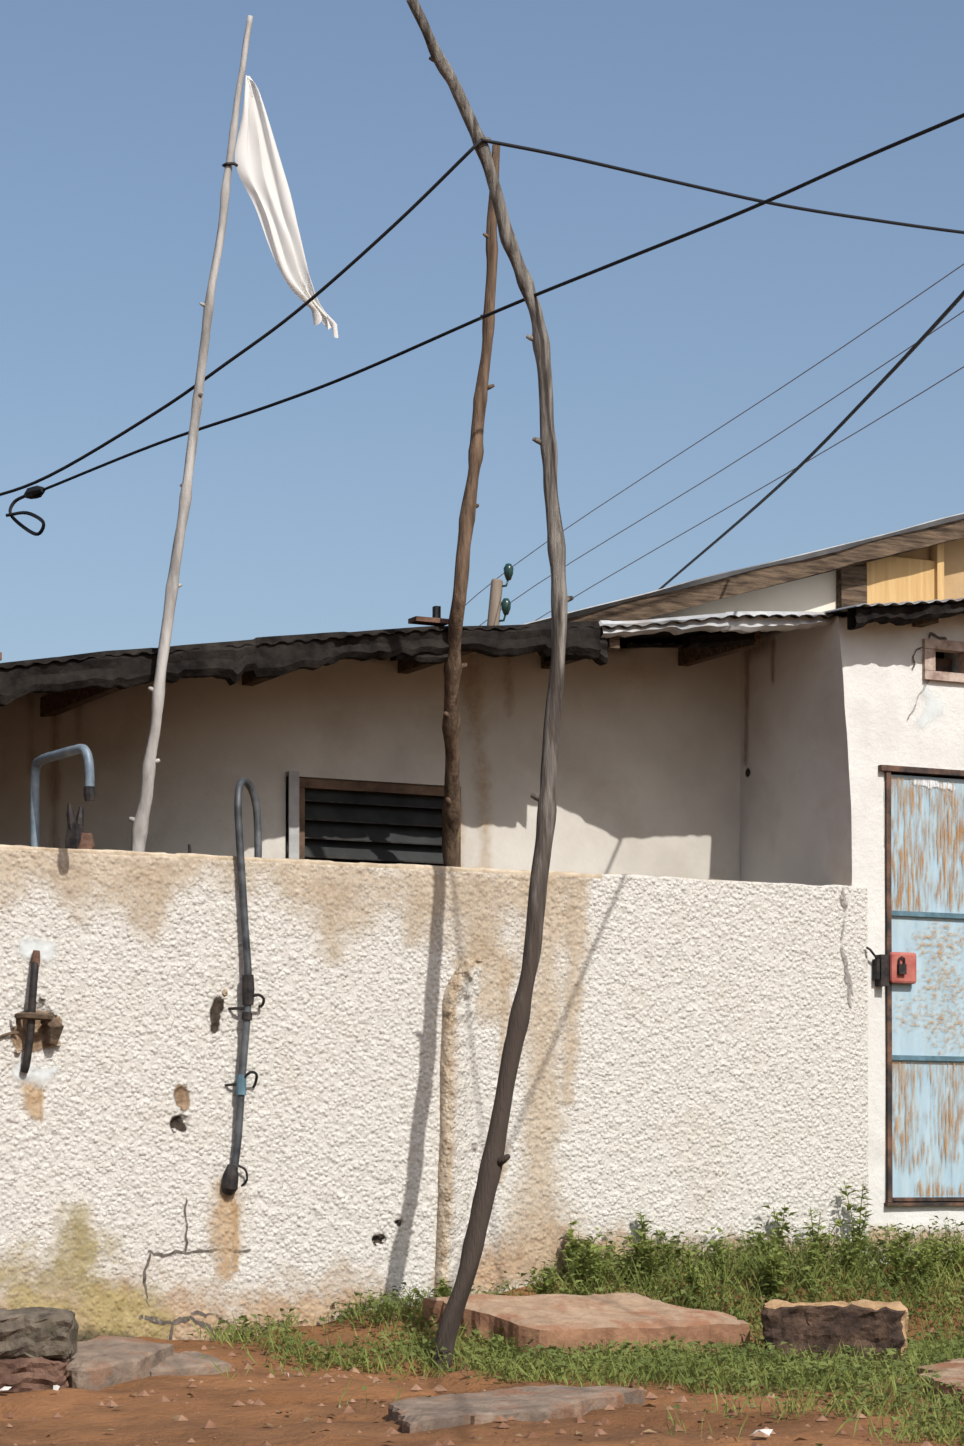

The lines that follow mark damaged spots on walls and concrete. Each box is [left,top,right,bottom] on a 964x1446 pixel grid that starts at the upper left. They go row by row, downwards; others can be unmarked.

crack [907,632,947,720]
water stain [0,849,204,897]
water stain [233,861,531,923]
rust [891,777,964,1196]
rust [25,1080,42,1120]
water stain [522,876,586,1260]
crack [139,1198,251,1340]
water stain [77,1331,101,1341]